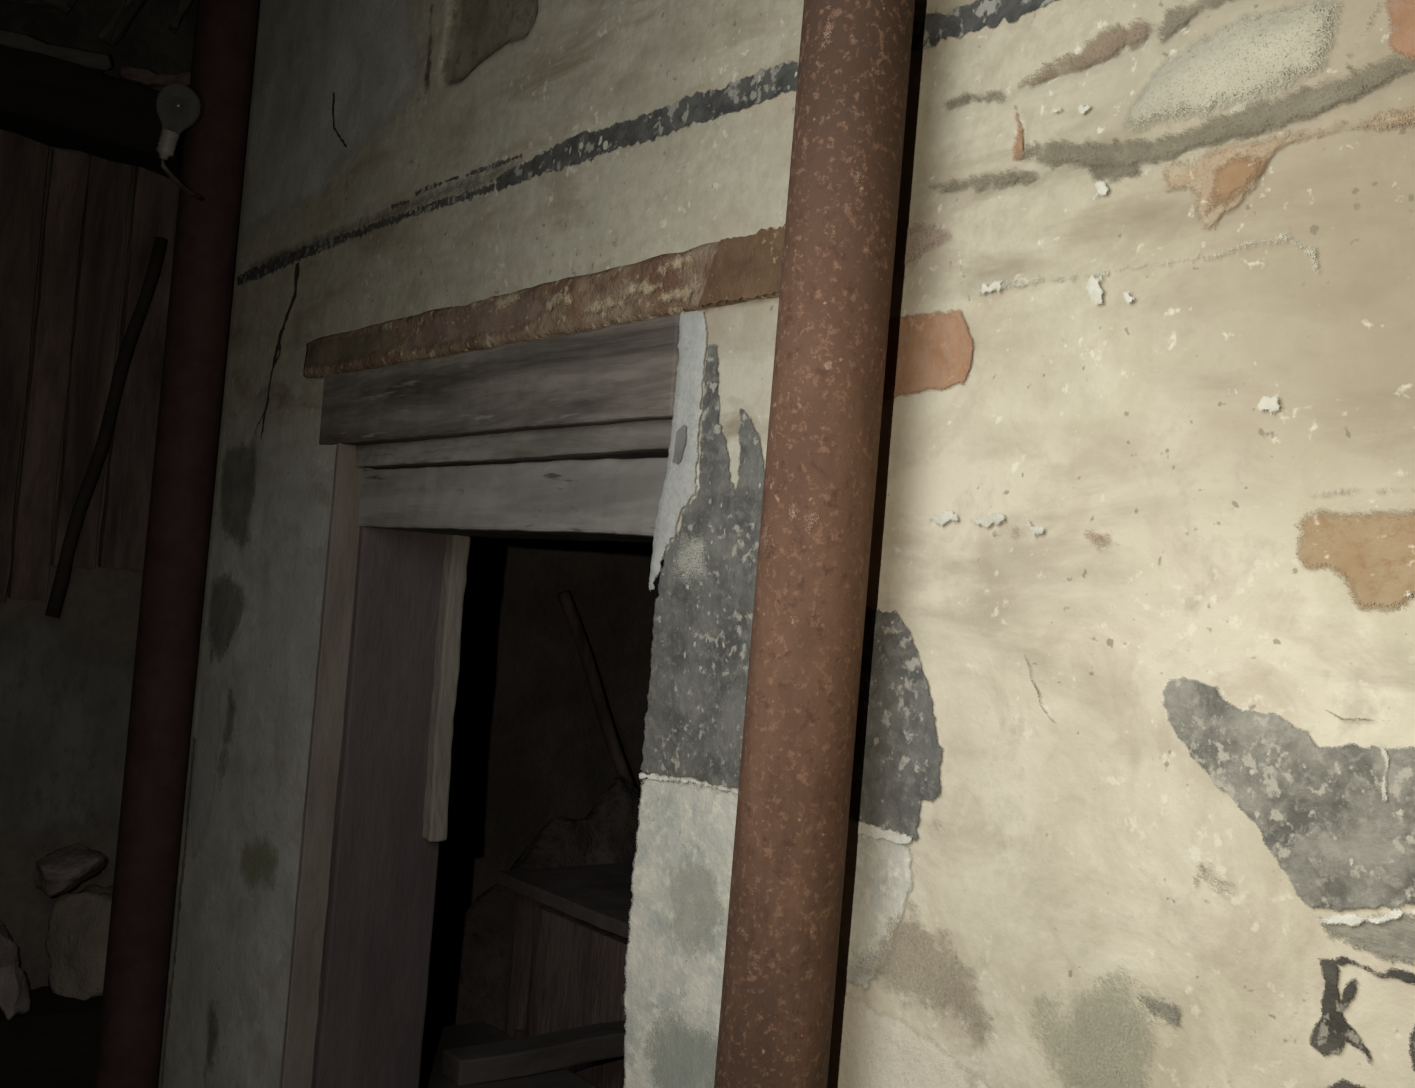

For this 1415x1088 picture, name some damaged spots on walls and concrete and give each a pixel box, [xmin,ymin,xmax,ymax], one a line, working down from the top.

flaking render [422,0,537,99]
flaking render [1383,0,1415,63]
flaking render [883,309,974,401]
flaking render [1294,486,1415,614]
peeling [624,344,765,1088]
peeling [836,606,942,990]
peeling [1161,676,1415,1063]
peeling [1327,1079,1365,1088]